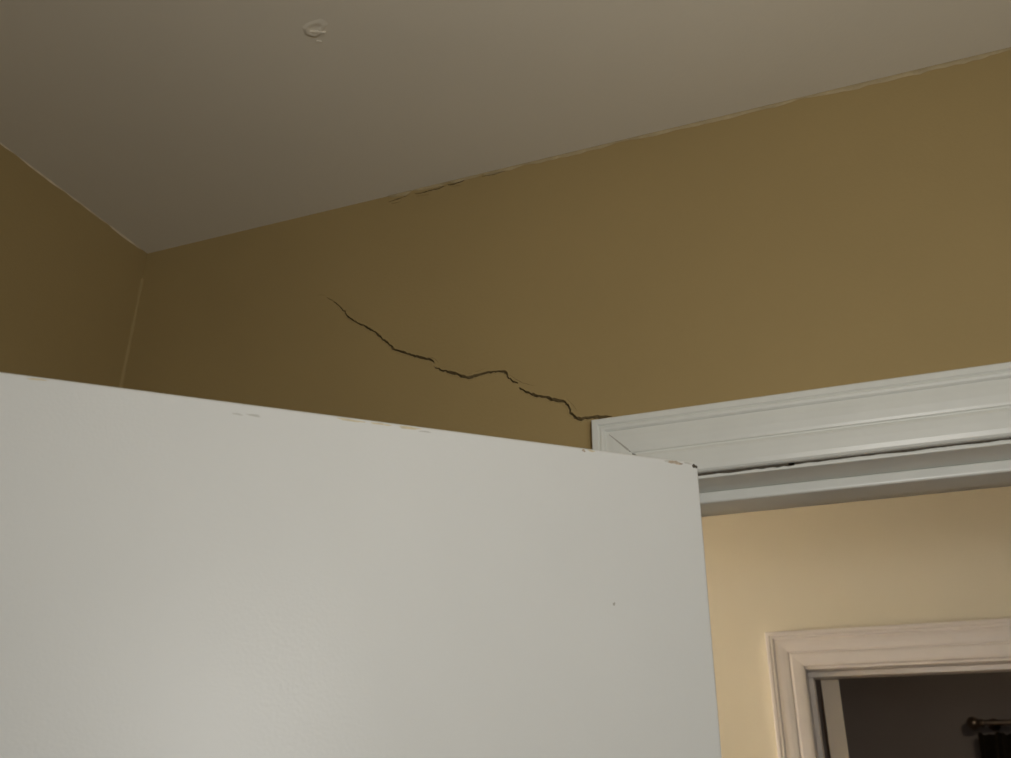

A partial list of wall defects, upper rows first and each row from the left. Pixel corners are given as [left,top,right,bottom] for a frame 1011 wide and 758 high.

crack [327,297,636,455]